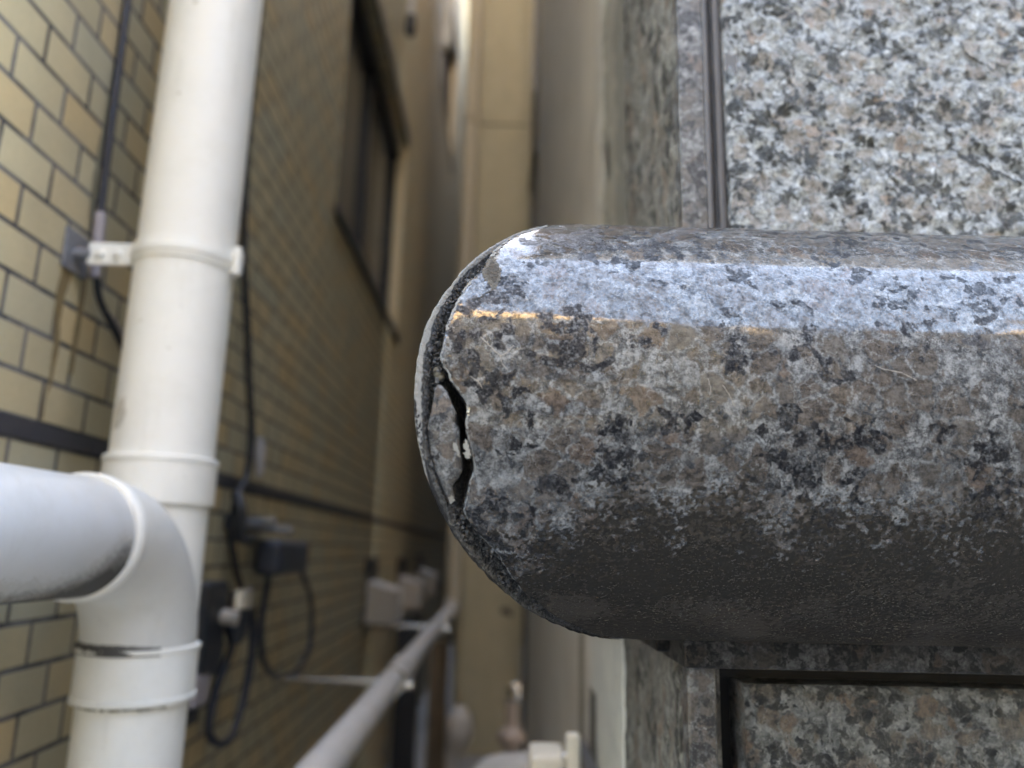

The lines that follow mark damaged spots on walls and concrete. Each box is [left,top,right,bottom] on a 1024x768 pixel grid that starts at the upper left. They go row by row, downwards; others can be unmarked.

crack [462,376,482,445]